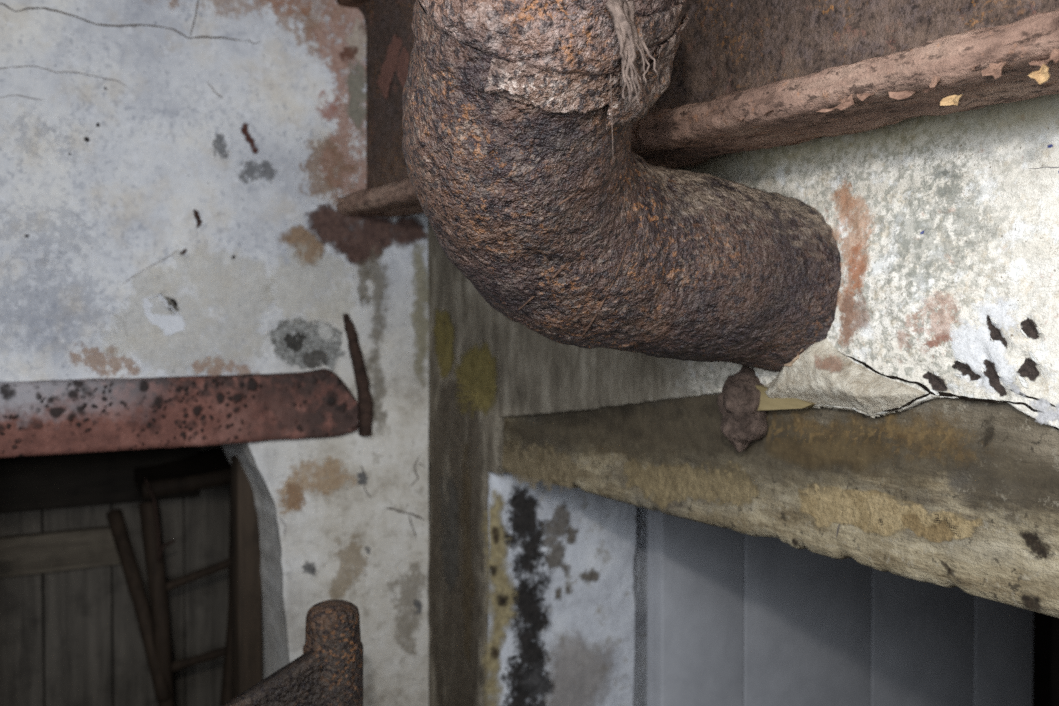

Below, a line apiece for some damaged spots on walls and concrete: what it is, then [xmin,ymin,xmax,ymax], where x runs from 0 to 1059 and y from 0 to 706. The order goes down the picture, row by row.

crack [0,0,259,44]
crack [0,65,128,88]
damp [300,139,356,204]
damp [282,225,324,264]
corrosion [71,346,138,376]
corrosion [192,357,257,376]
peeling [923,299,1059,424]
crack [840,352,1059,430]
damp [501,486,612,706]